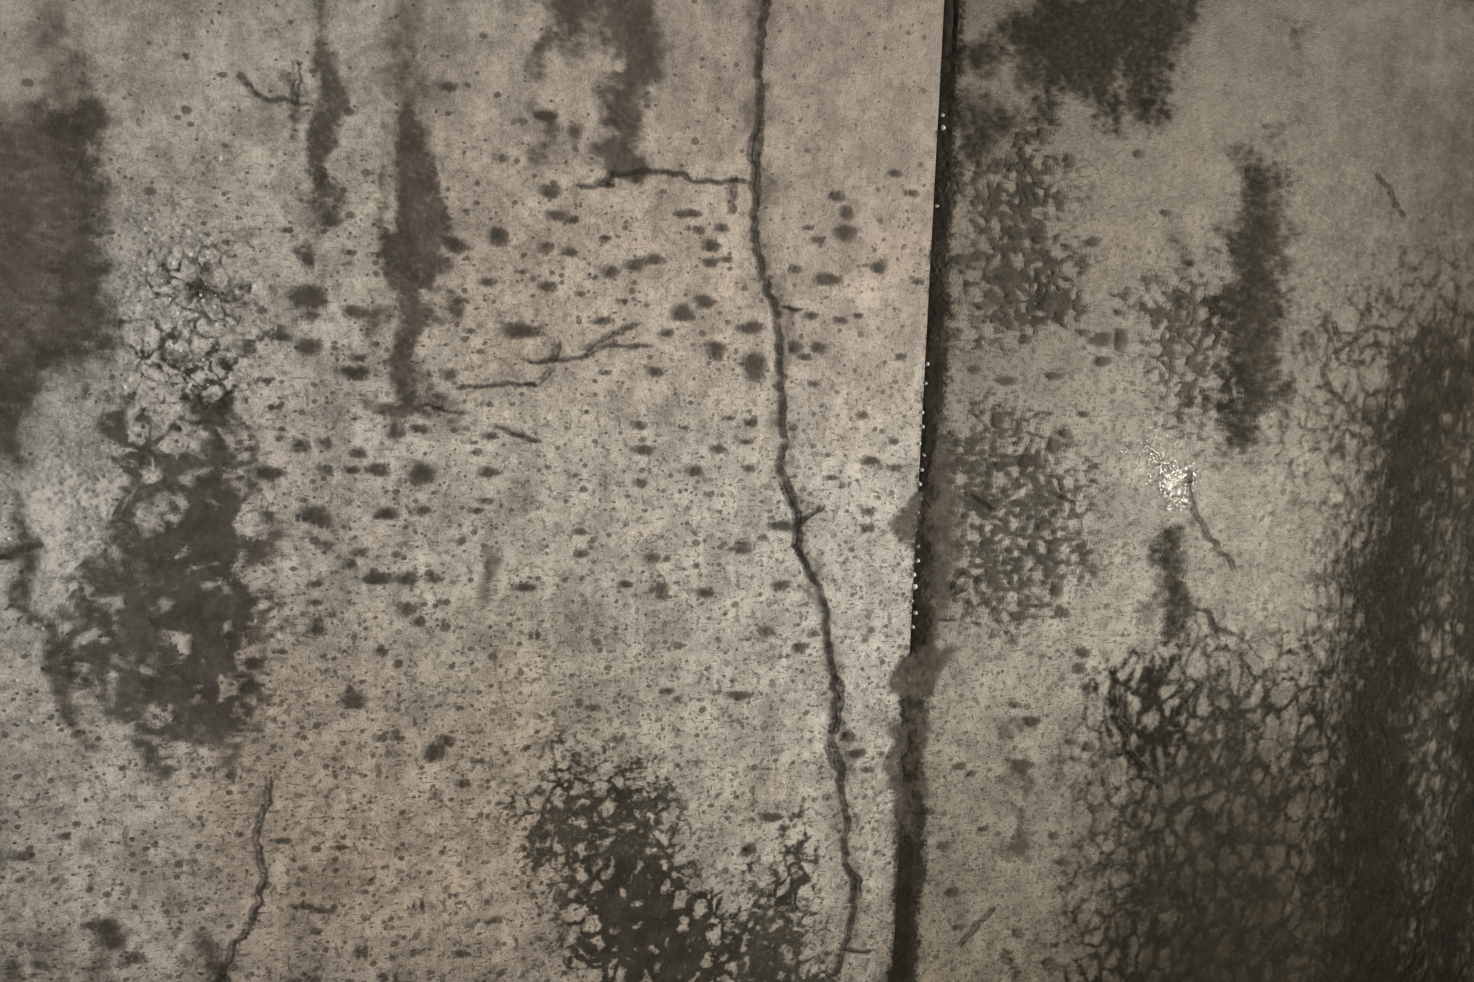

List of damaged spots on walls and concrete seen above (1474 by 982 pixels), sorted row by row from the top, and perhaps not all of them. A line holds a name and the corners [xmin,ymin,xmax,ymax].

damp [283,0,349,227]
damp [520,0,674,183]
damp [347,35,497,440]
damp [0,54,327,781]
damp [276,404,390,476]
crack [579,0,875,976]
damp [846,0,1474,982]
crack [1112,666,1228,790]
crack [1188,472,1236,567]
crack [1196,606,1237,636]
crack [219,777,274,982]
damp [501,729,840,982]